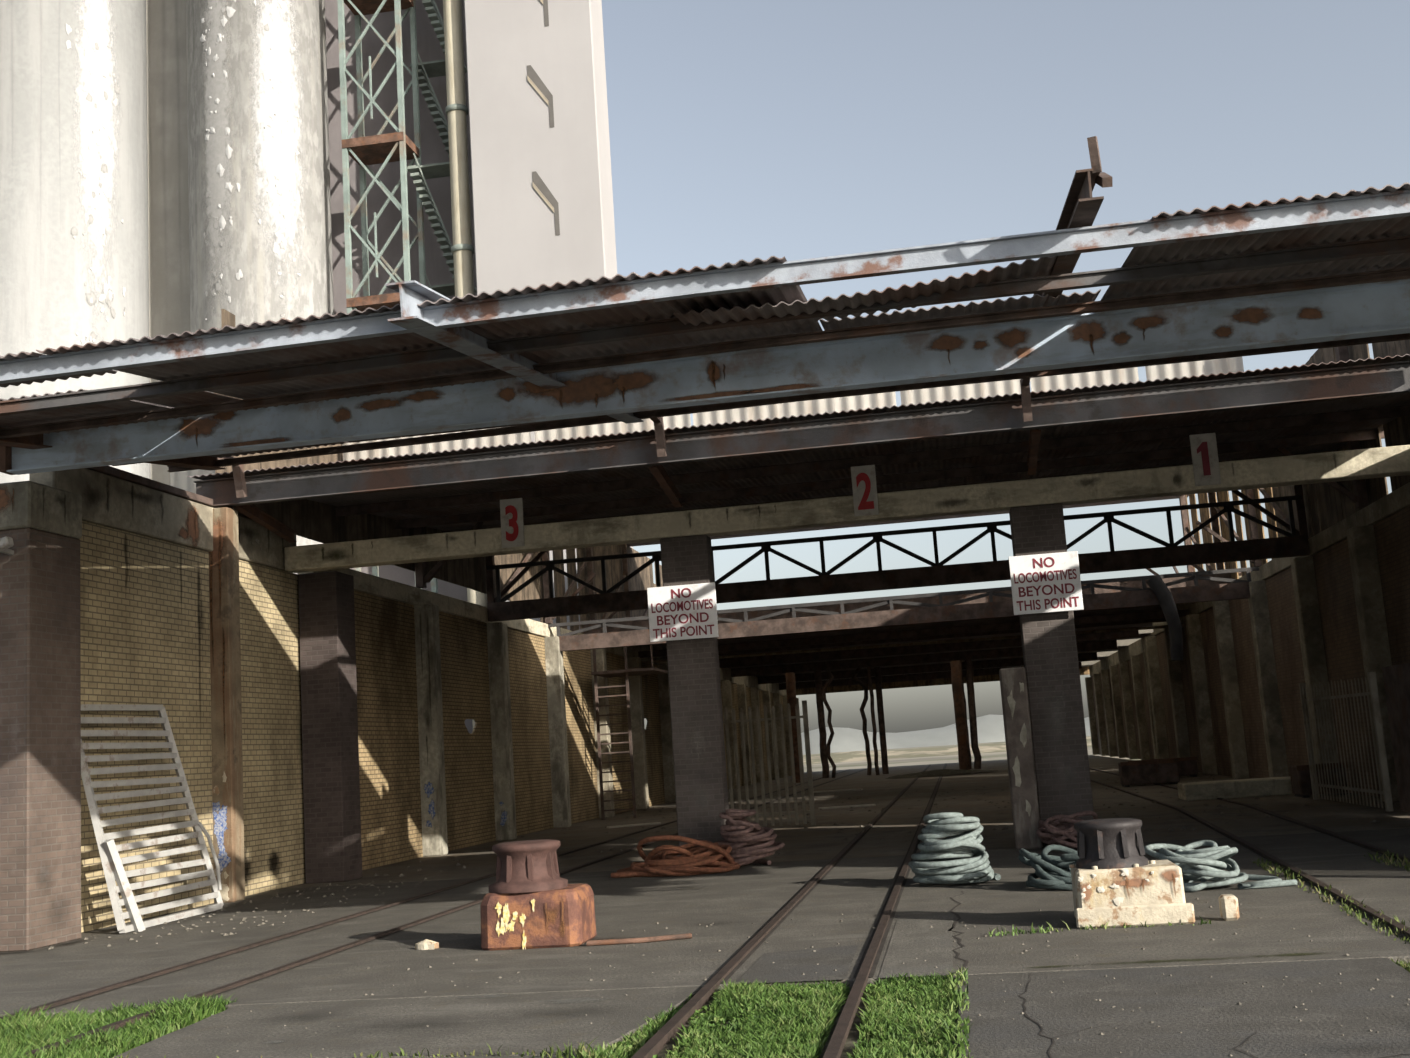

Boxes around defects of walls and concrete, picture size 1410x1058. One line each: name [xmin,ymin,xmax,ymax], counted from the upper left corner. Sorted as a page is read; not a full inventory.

peeling [66,0,126,322]
peeling [200,0,305,318]
corrosion [929,328,1032,363]
corrosion [1069,315,1165,354]
corrosion [1213,307,1271,338]
corrosion [1298,308,1322,319]
corrosion [333,390,442,422]
corrosion [498,371,656,407]
corrosion [667,361,817,401]
corrosion [178,411,236,444]
corrosion [224,438,289,447]